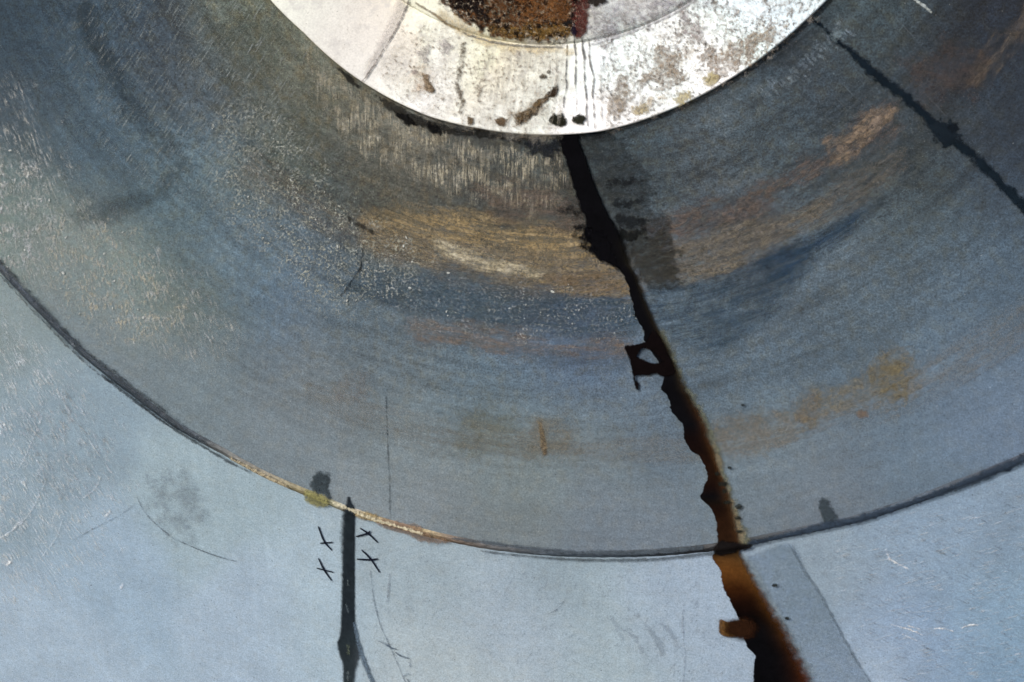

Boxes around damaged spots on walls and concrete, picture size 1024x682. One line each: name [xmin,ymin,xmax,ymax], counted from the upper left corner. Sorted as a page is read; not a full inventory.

corrosion [648,107,896,250]